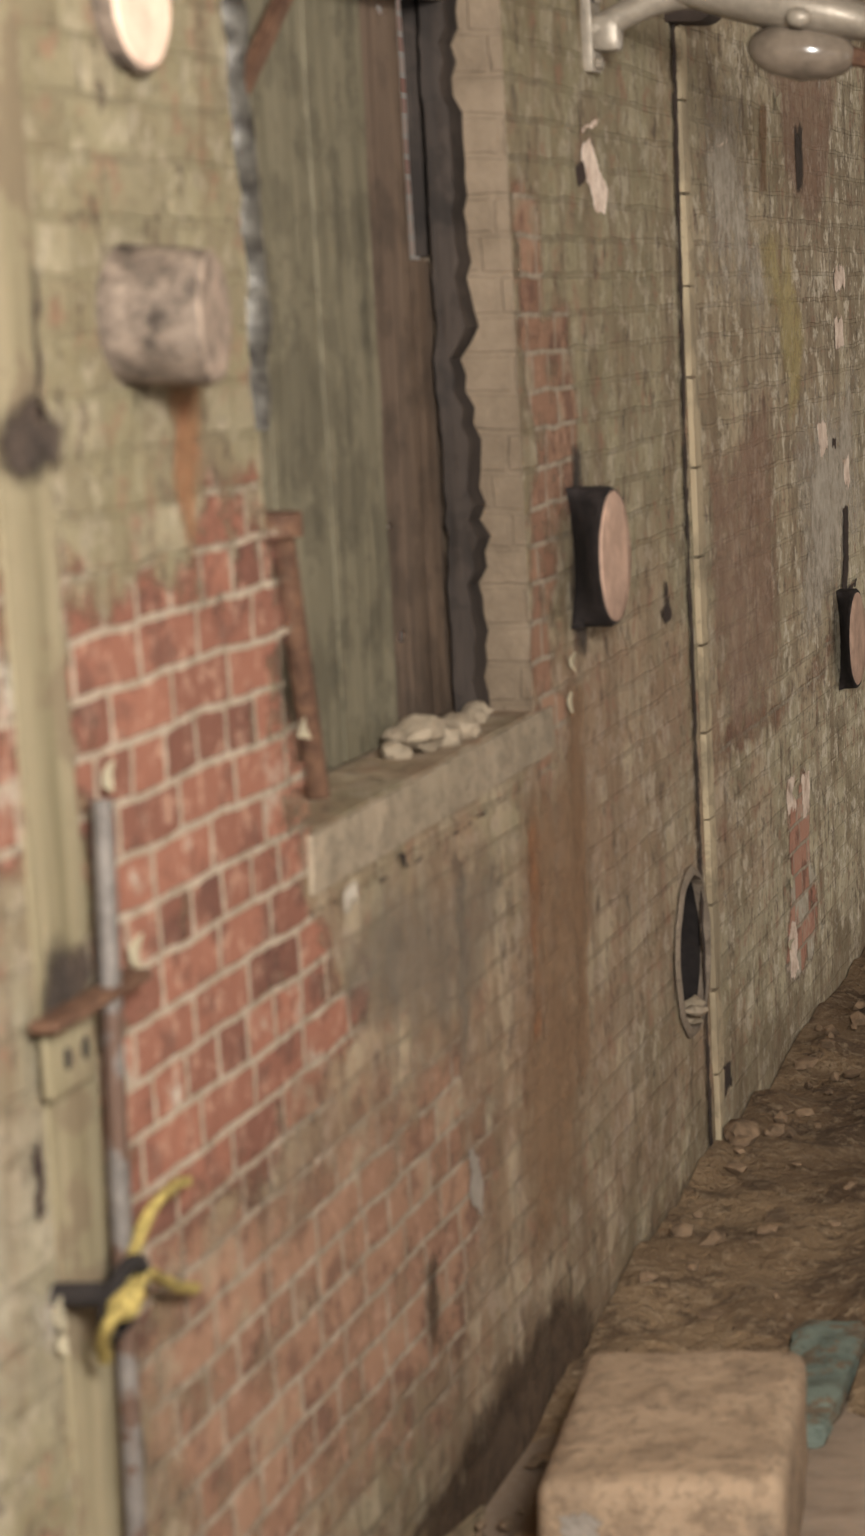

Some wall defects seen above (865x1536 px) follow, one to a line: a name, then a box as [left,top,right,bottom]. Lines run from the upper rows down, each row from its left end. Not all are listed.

flaking render [0,631,24,883]
flaking render [59,463,497,1536]
spalling [786,770,823,981]